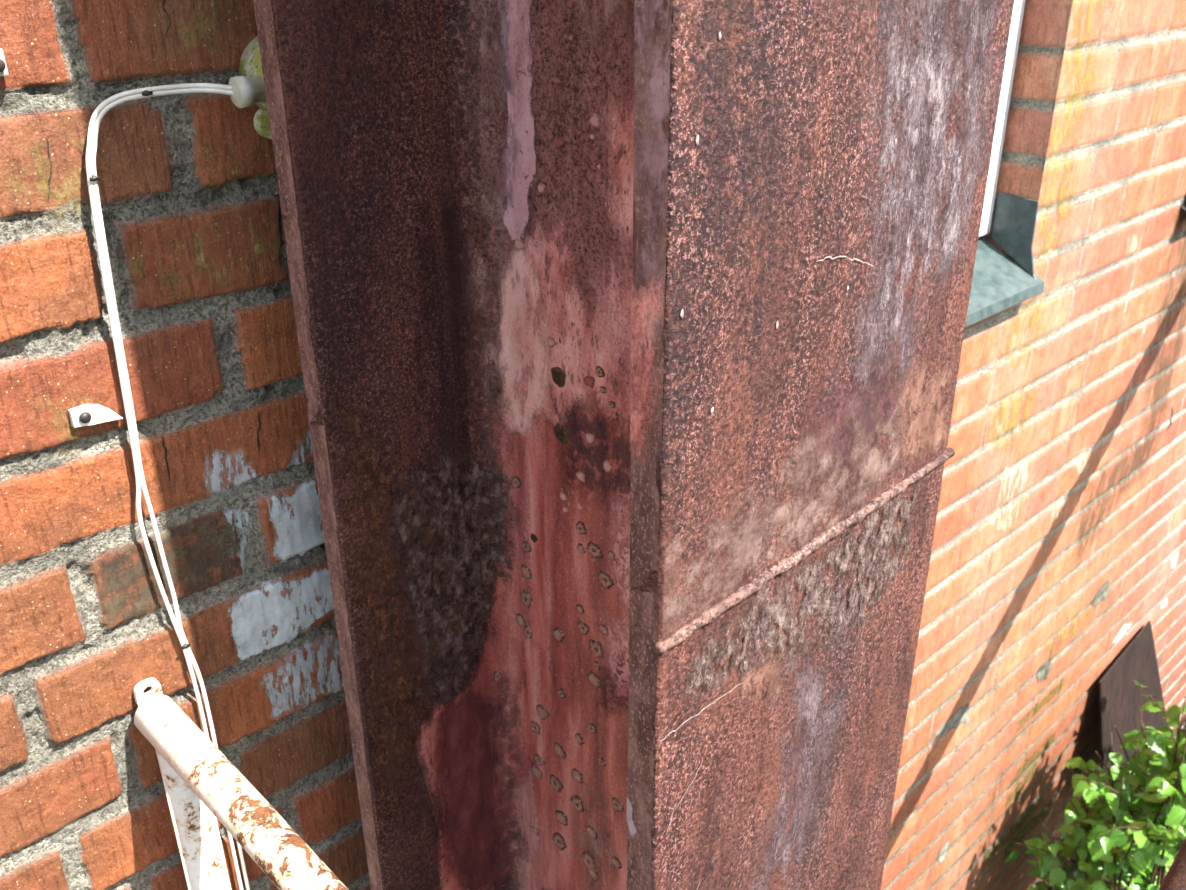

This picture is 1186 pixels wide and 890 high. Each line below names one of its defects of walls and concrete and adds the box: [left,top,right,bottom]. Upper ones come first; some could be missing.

peeling [288,430,313,468]
rust [253,0,383,890]
peeling [418,0,670,890]
rust [551,367,566,388]
rust [595,366,619,420]
rust [611,0,951,890]
peeling [205,451,257,571]
peeling [267,480,325,562]
rust [392,450,538,703]
rust [576,521,616,589]
peeling [228,569,344,717]
rust [531,742,584,851]